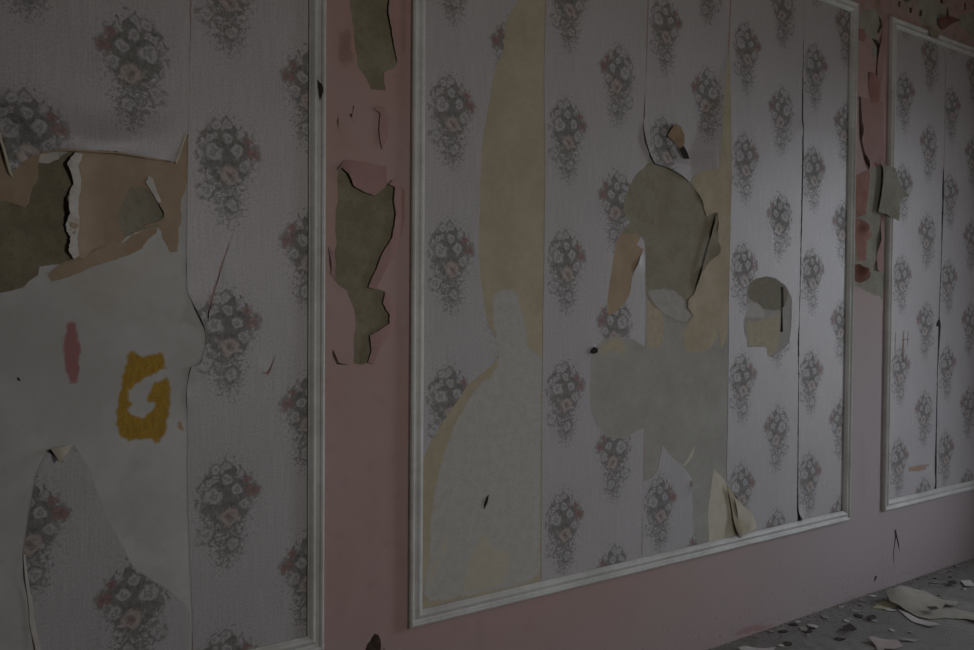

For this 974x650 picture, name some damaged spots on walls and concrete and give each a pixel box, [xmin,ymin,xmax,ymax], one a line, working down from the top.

peeling [334,0,406,90]
flaking render [0,151,76,293]
flaking render [116,186,164,238]
peeling [329,160,405,365]
flaking render [621,162,718,323]
flaking render [746,276,790,312]
peeling [854,9,908,300]
flaking render [362,630,384,650]